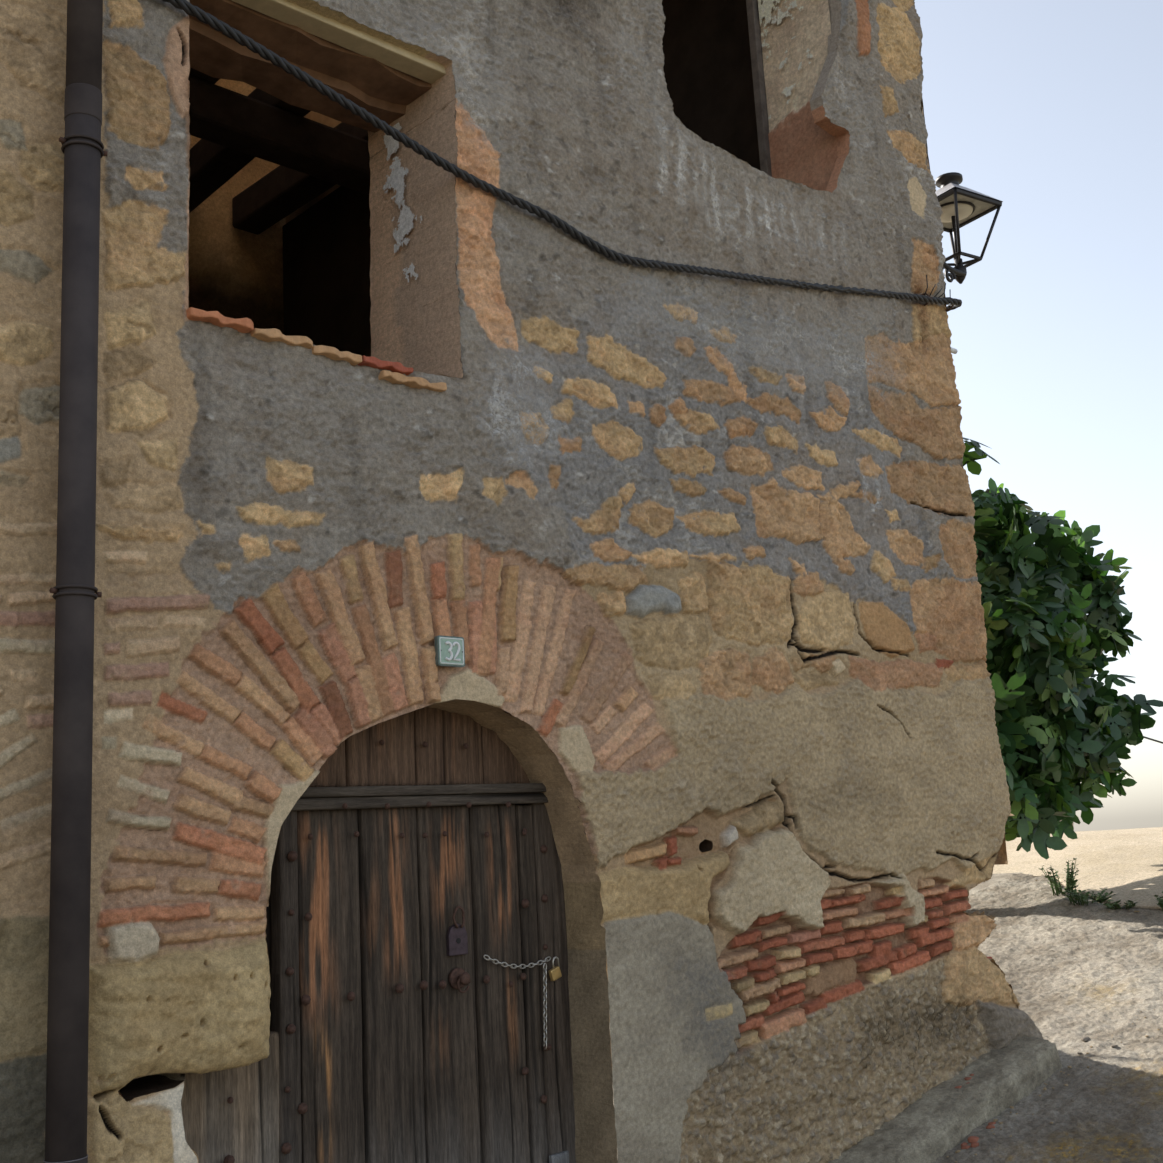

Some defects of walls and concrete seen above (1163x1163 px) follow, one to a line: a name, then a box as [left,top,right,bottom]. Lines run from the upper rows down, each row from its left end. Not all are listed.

peeling [758,0,813,104]
flaking render [839,0,930,219]
peeling [383,122,422,253]
flaking render [454,97,990,702]
flaking render [215,454,328,573]
flaking render [419,466,466,503]
crack [787,580,910,662]
crack [877,703,912,738]
crack [745,778,904,882]
crack [936,850,996,871]
flaking render [624,797,1043,1163]
flaking render [118,1073,199,1163]